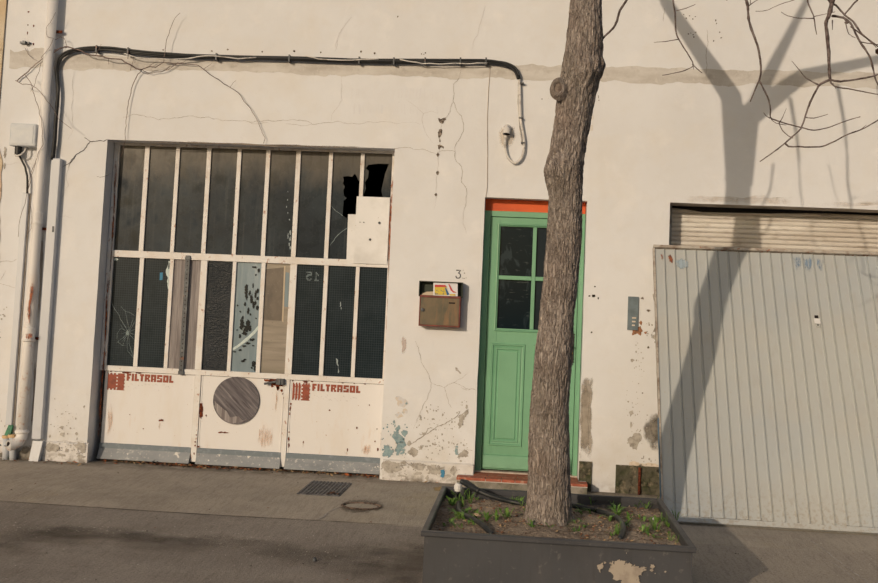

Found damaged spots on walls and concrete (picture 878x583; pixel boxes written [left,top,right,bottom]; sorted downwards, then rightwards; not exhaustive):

crack [60,79,107,217]
crack [130,72,467,230]
peeling [381,396,469,480]
crack [413,341,475,443]
flaking render [631,321,655,370]
peeling [627,381,659,467]